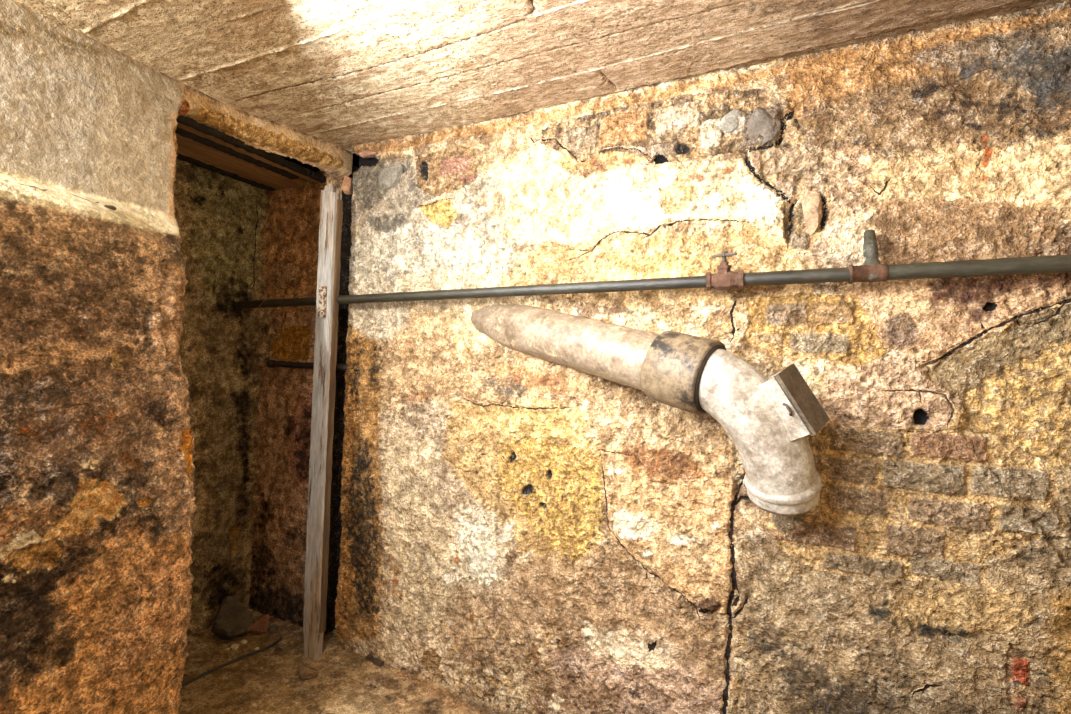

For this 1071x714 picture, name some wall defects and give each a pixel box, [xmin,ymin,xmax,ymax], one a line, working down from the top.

crack [236,0,748,113]
water stain [938,51,1071,120]
crack [567,218,750,261]
spalling [540,88,835,250]
crack [745,111,828,236]
water stain [943,188,972,201]
water stain [1002,126,1071,205]
crack [882,296,1071,433]
water stain [28,459,108,498]
water stain [100,506,159,536]
water stain [0,530,107,673]
crack [599,449,750,714]